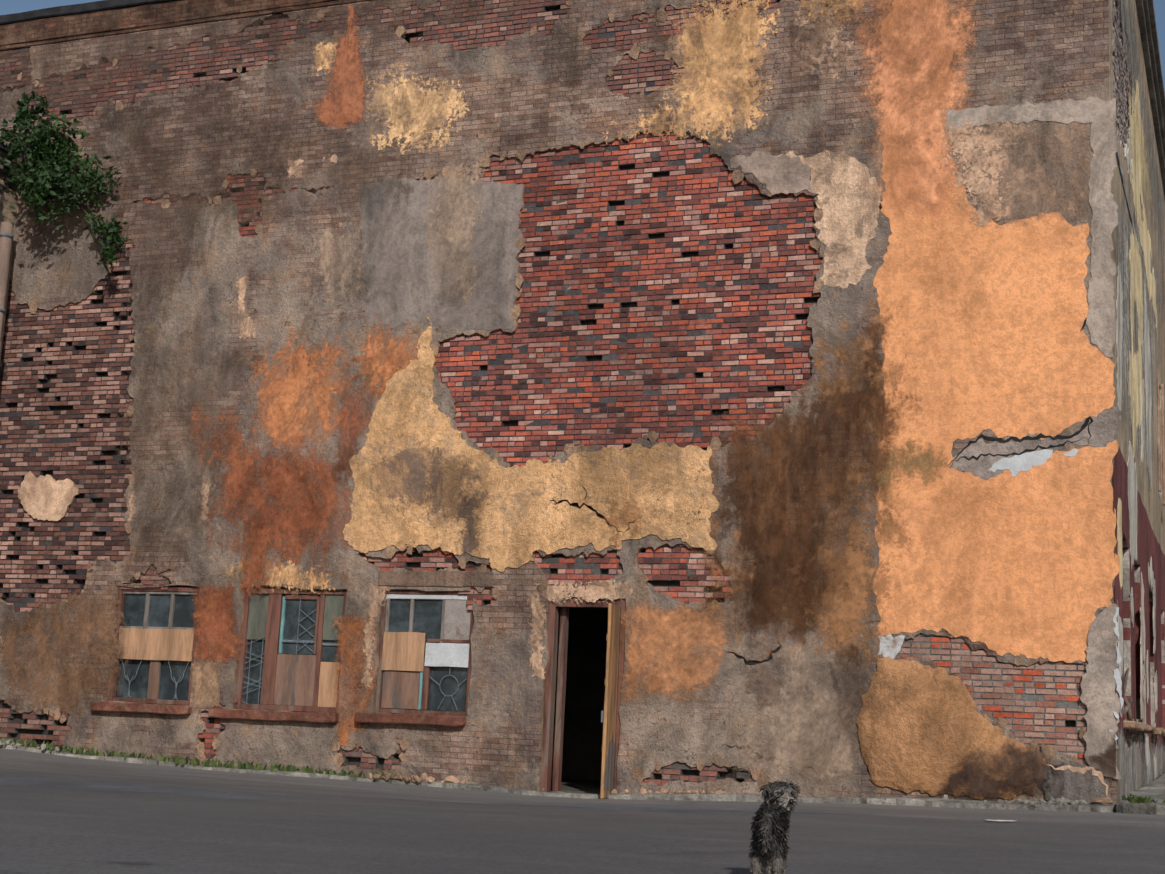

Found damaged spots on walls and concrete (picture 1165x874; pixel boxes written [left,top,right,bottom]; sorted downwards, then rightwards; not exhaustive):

flaking render [0,239,137,612]
crack [553,500,634,532]
flaking render [419,131,823,467]
water stain [621,601,727,701]
water stain [730,306,947,783]
peeling [873,0,1165,780]